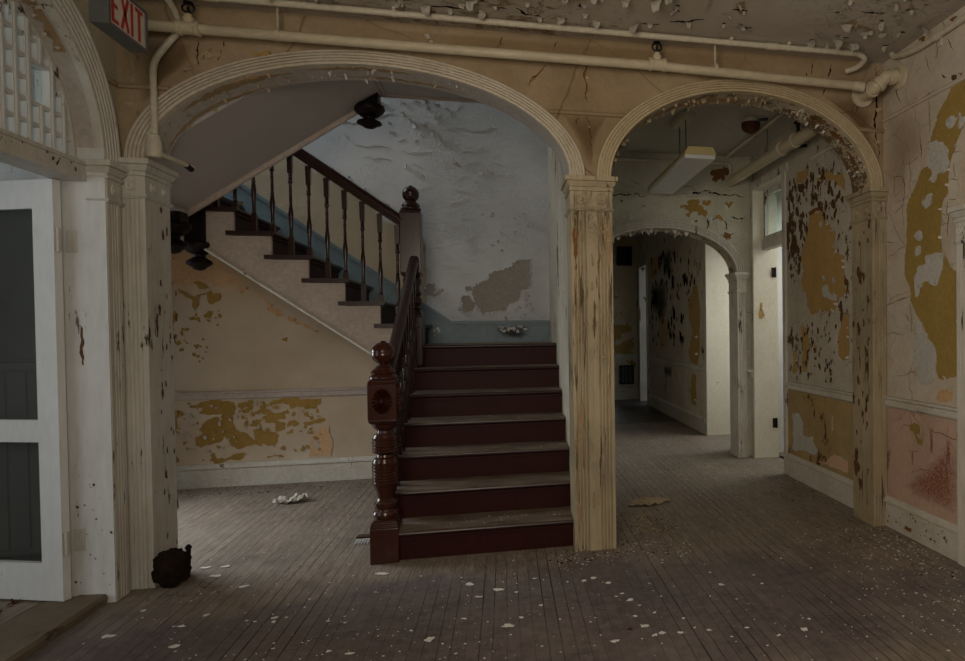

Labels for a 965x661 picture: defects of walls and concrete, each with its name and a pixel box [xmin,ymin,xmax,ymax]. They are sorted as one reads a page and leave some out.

peeling [421,0,542,23]
peeling [629,0,704,34]
peeling [806,0,929,54]
peeling [591,215,696,276]
peeling [904,72,965,403]
peeling [156,255,249,363]
peeling [613,93,870,491]
peeling [167,397,333,464]